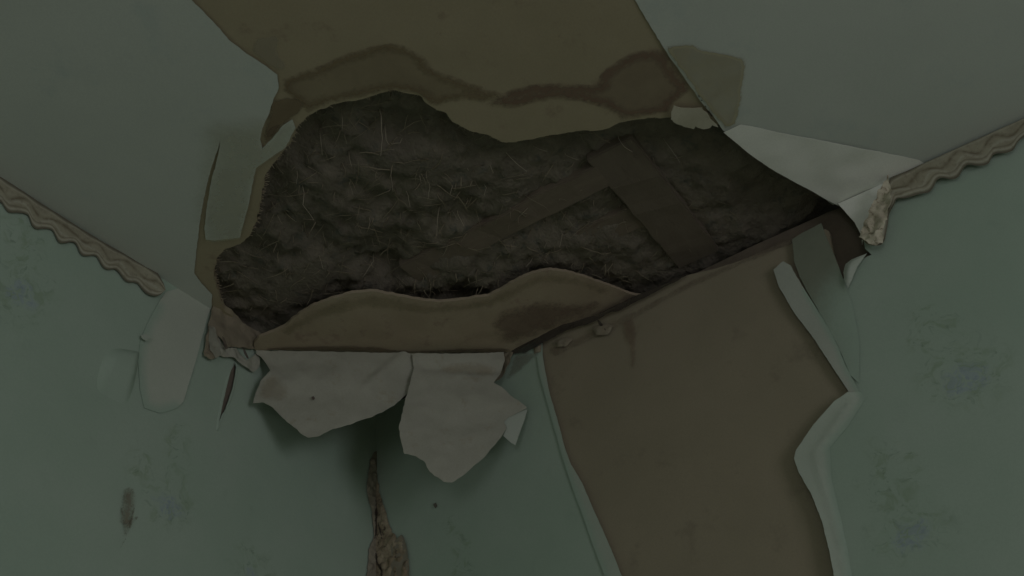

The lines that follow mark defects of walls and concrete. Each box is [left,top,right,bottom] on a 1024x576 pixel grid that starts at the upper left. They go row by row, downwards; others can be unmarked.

water stain [285,44,745,126]
peeling [192,0,923,319]
peeling [542,243,848,576]